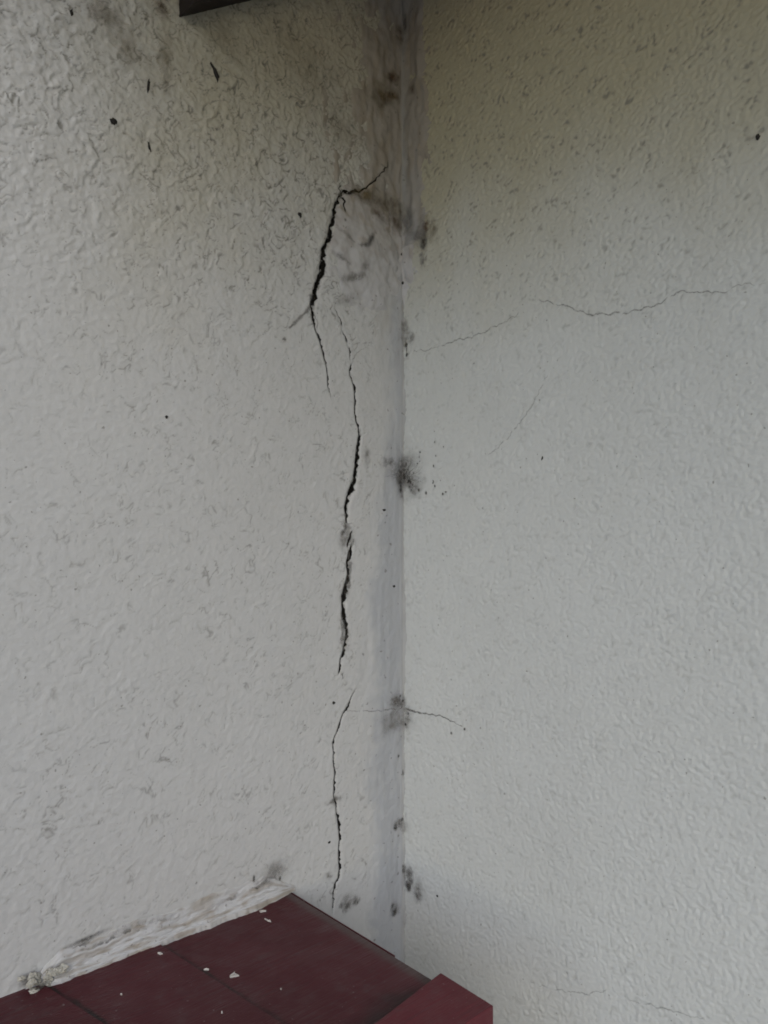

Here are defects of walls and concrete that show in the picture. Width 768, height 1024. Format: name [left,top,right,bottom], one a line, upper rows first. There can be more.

crack [283,163,388,908]
leakage [390,451,447,495]